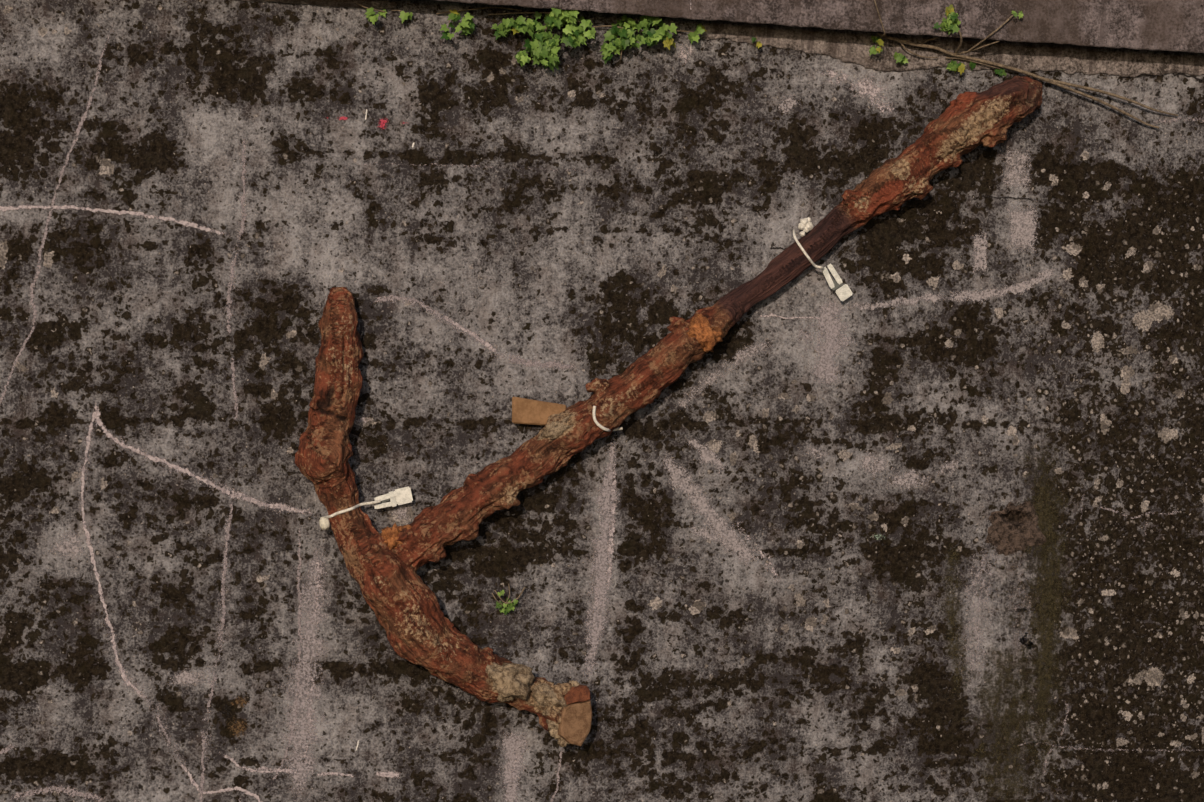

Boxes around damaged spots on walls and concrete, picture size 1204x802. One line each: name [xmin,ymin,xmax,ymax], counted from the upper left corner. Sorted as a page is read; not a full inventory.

leakage [679,342,771,408]
leakage [798,269,1054,384]
leakage [688,439,724,474]
leakage [585,438,620,675]
leakage [662,457,778,581]
spalling [985,501,1047,556]
leakage [283,551,331,800]
leakage [942,446,1072,802]
leakage [499,732,528,802]